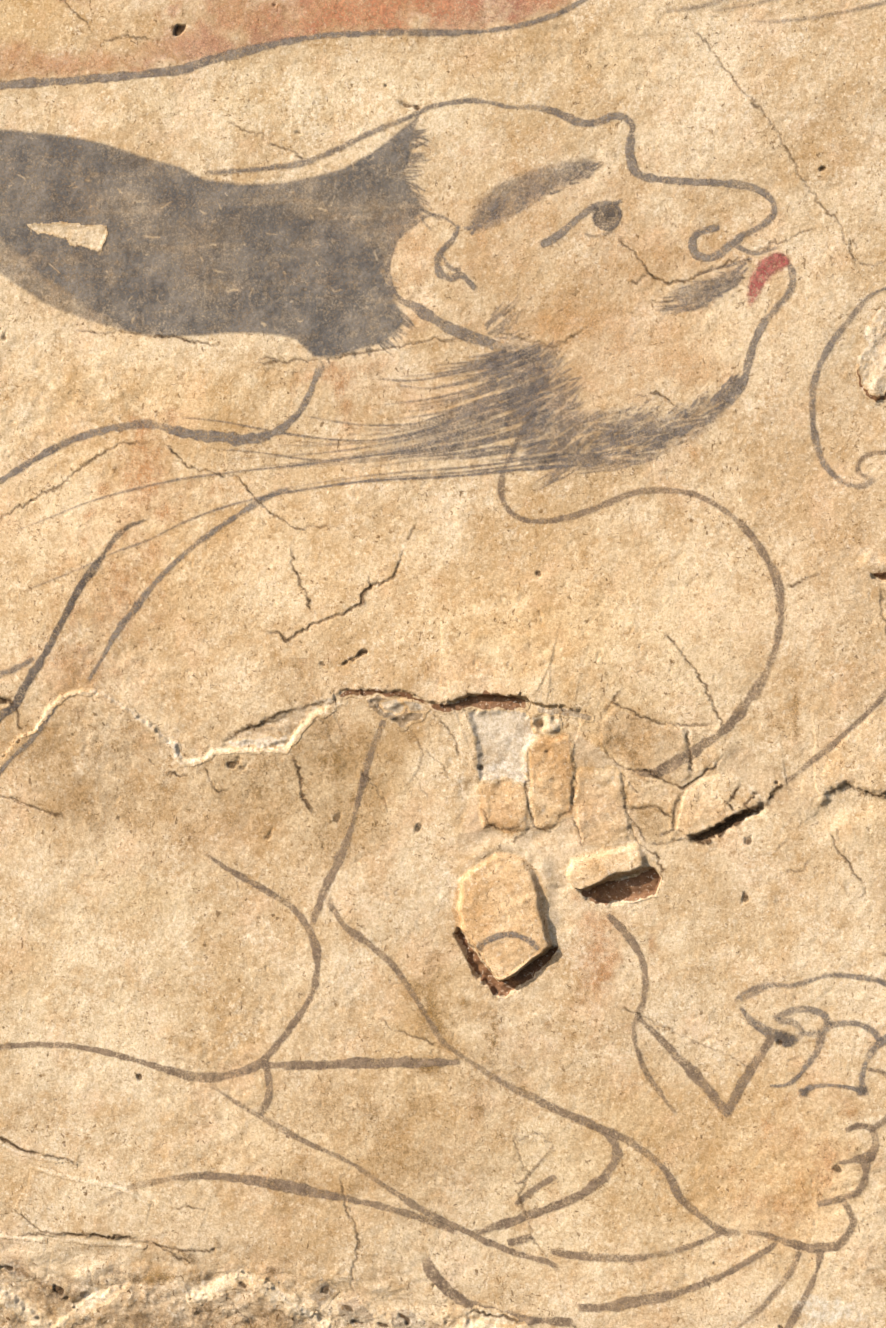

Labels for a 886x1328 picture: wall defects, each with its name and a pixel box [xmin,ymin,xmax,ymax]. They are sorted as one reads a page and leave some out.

crack [169,448,415,643]
crack [0,697,21,729]
crack [293,760,310,810]
crack [606,637,783,871]
flaking render [0,1233,519,1328]